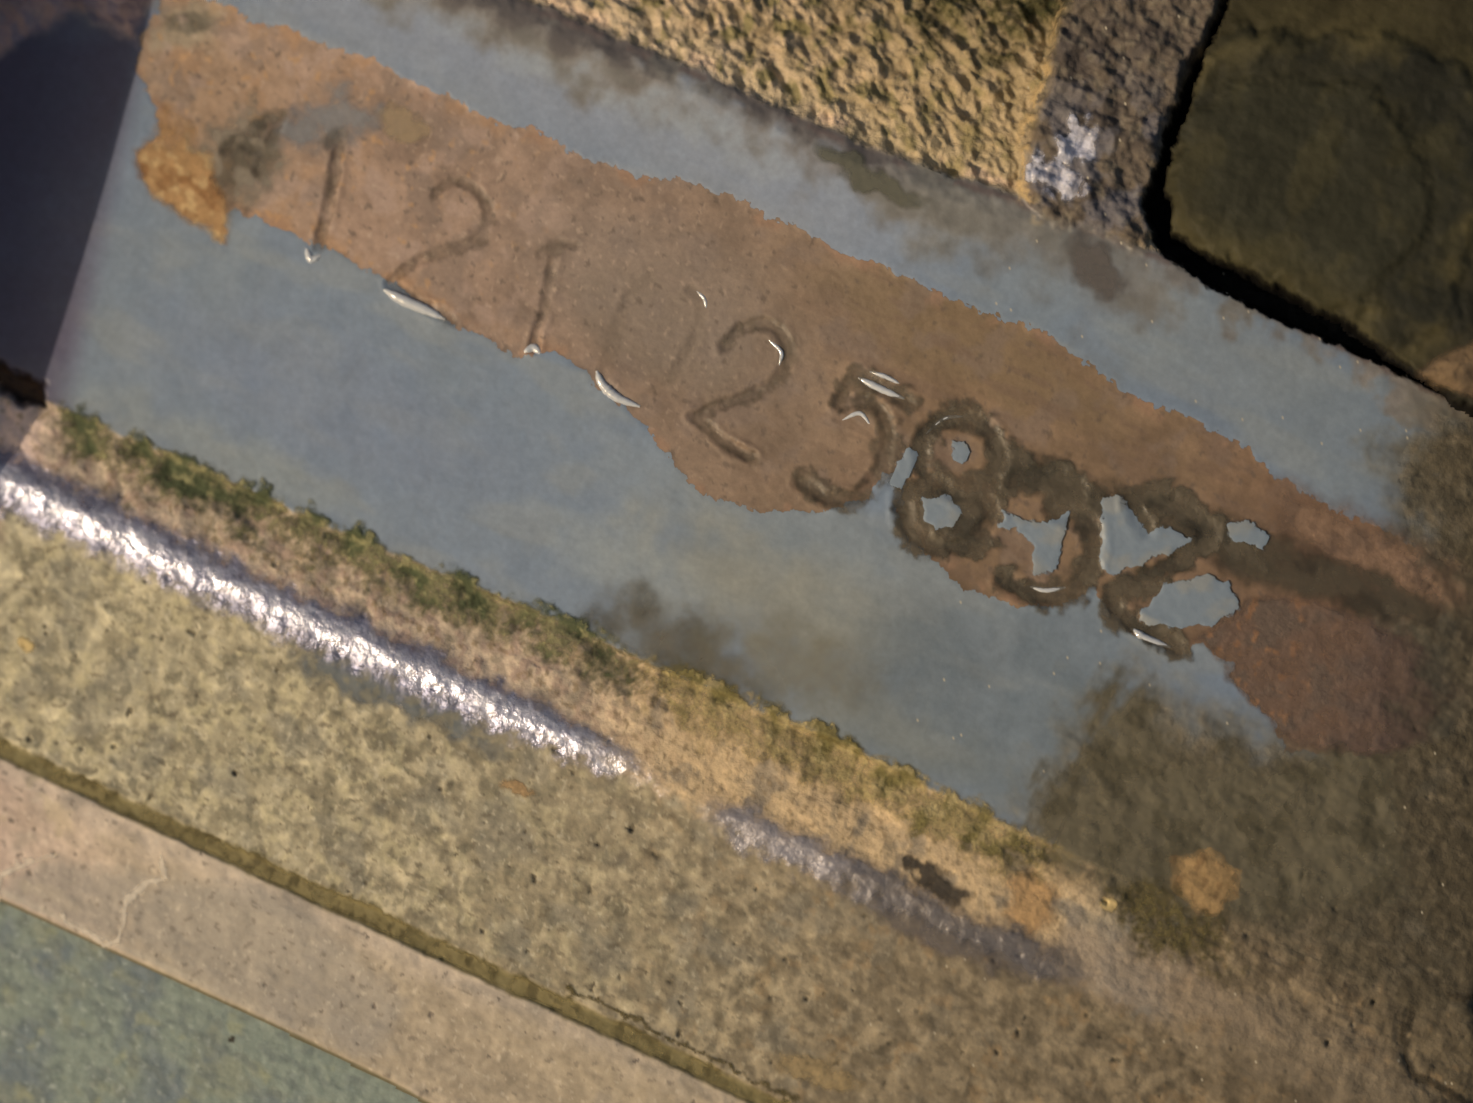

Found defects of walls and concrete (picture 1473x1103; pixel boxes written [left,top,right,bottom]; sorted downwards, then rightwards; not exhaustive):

efflorescence [1025,113,1099,200]
peeling [135,0,1473,758]
crack [1400,1011,1467,1103]